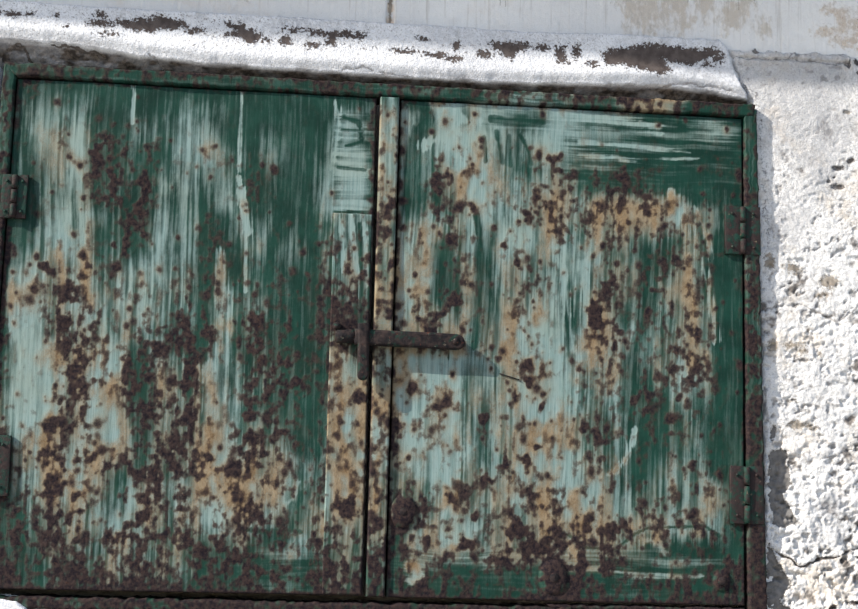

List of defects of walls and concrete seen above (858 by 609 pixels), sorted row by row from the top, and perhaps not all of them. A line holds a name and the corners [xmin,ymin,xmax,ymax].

peeling [84,9,207,38]
peeling [224,19,371,50]
peeling [388,35,466,63]
peeling [476,39,725,76]
spalling [767,426,797,528]
crack [775,548,858,568]
spalling [766,543,792,609]